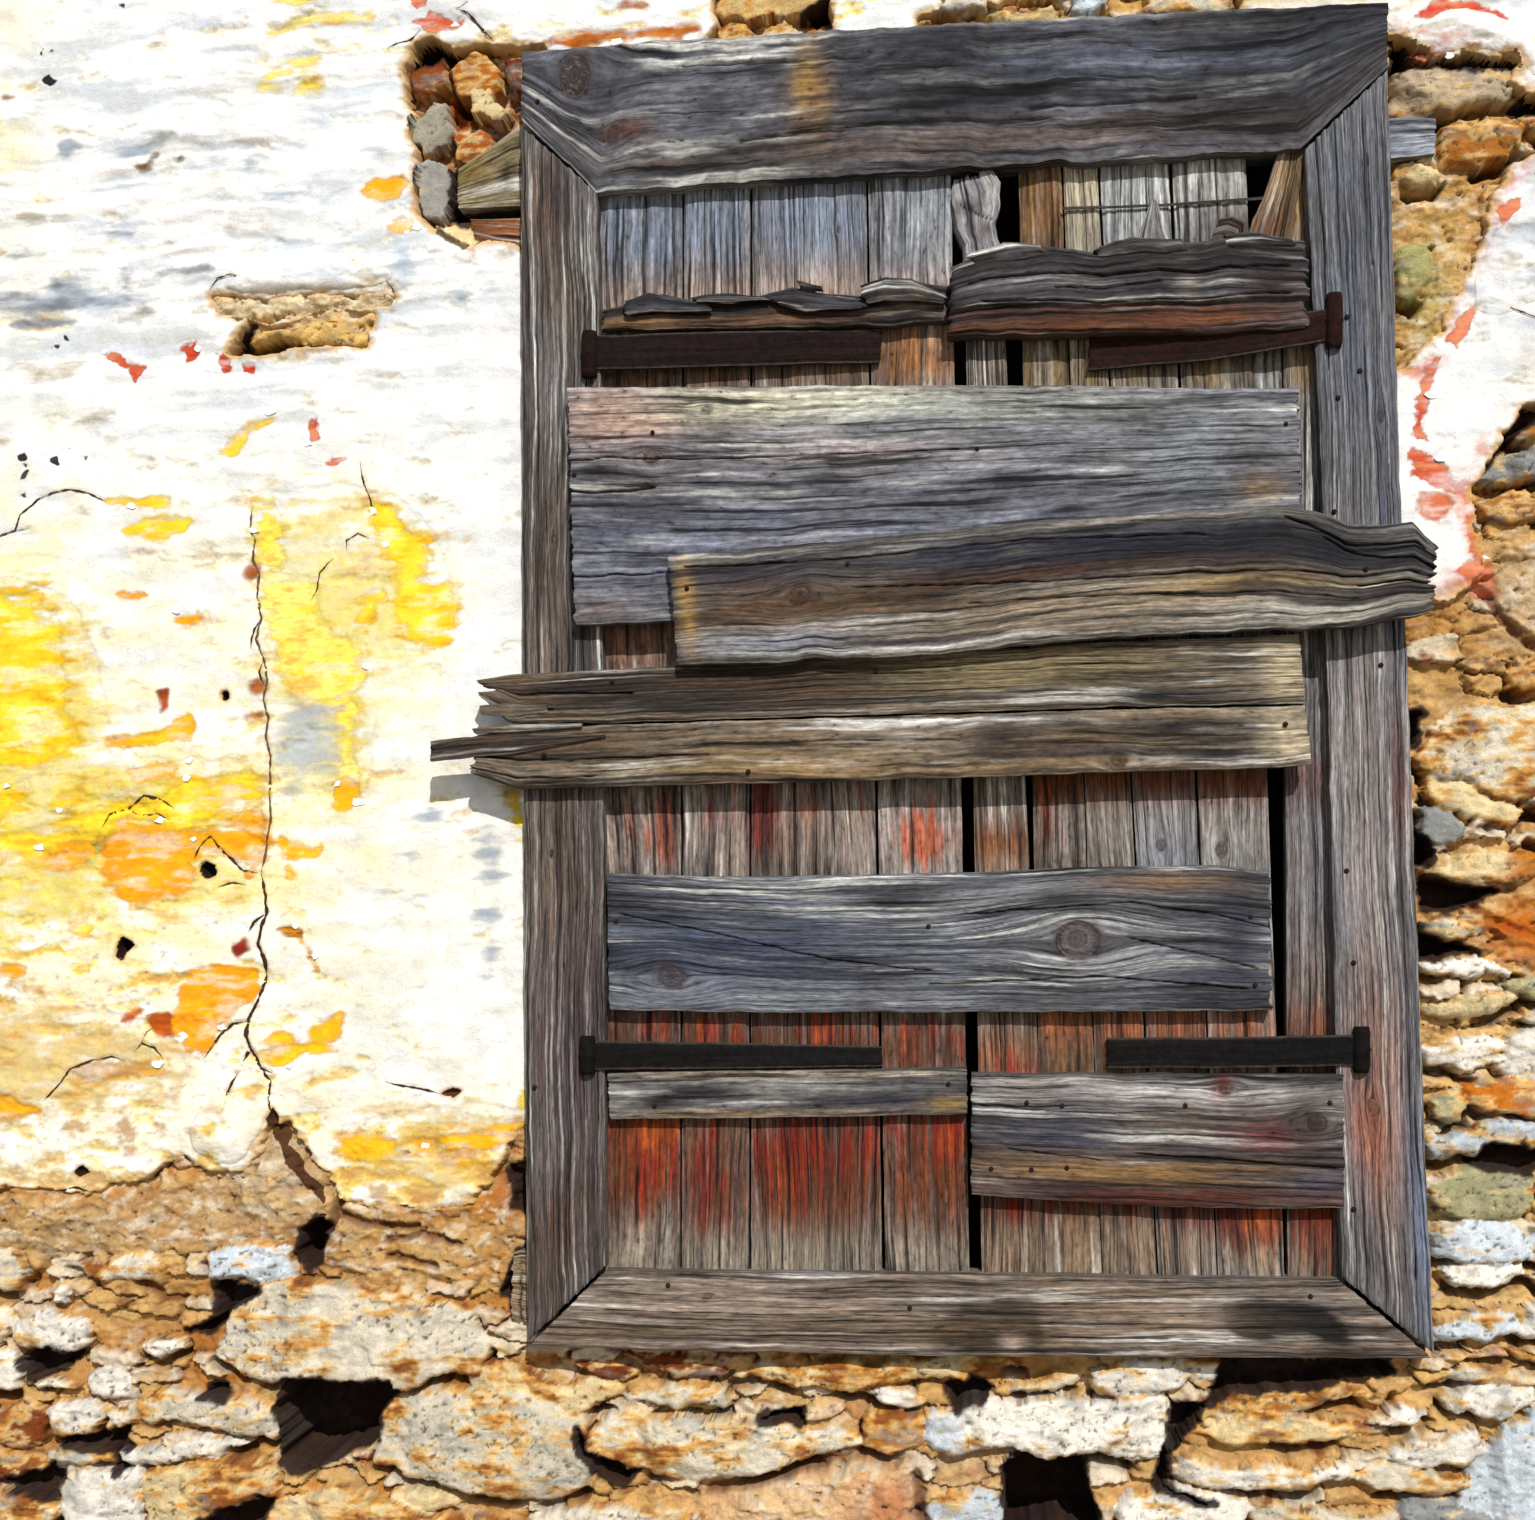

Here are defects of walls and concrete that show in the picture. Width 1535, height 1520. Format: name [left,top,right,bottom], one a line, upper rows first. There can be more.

spalling [550,0,832,48]
spalling [918,0,1240,25]
peeling [1416,0,1508,20]
spalling [361,0,525,247]
spalling [1386,41,1535,370]
peeling [180,341,201,363]
spalling [212,293,395,373]
crack [0,489,105,536]
spalling [0,357,1535,1520]